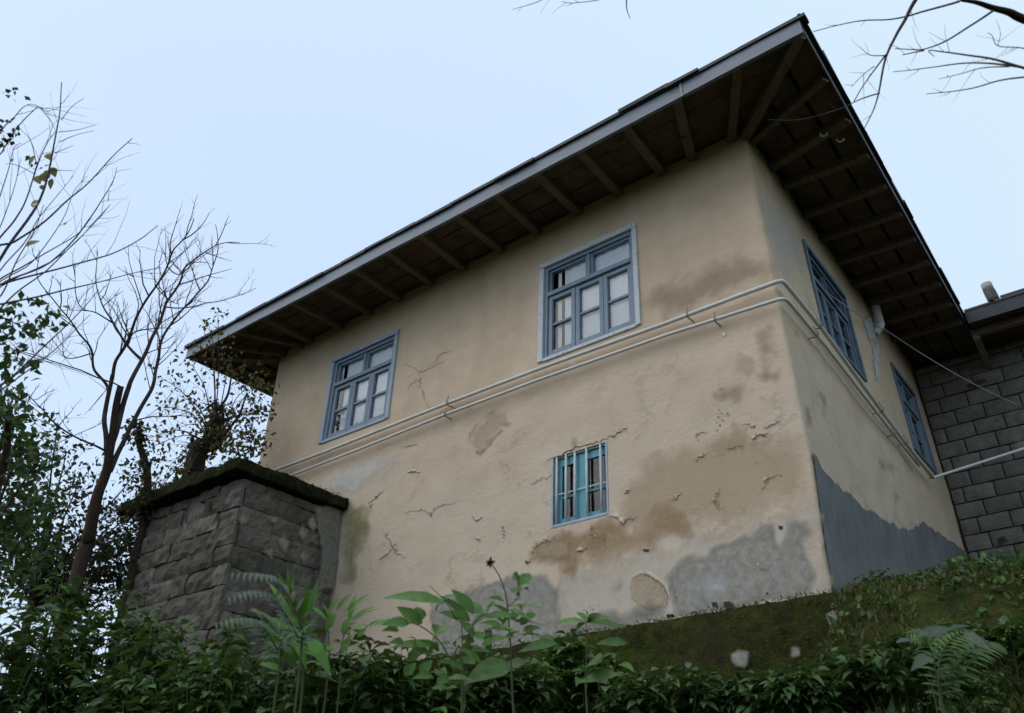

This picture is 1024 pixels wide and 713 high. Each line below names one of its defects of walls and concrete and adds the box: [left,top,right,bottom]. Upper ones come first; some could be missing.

crack [531,426,628,485]
crack [406,502,455,519]
crack [378,532,406,560]
peeling [630,524,813,617]
peeling [430,576,559,658]